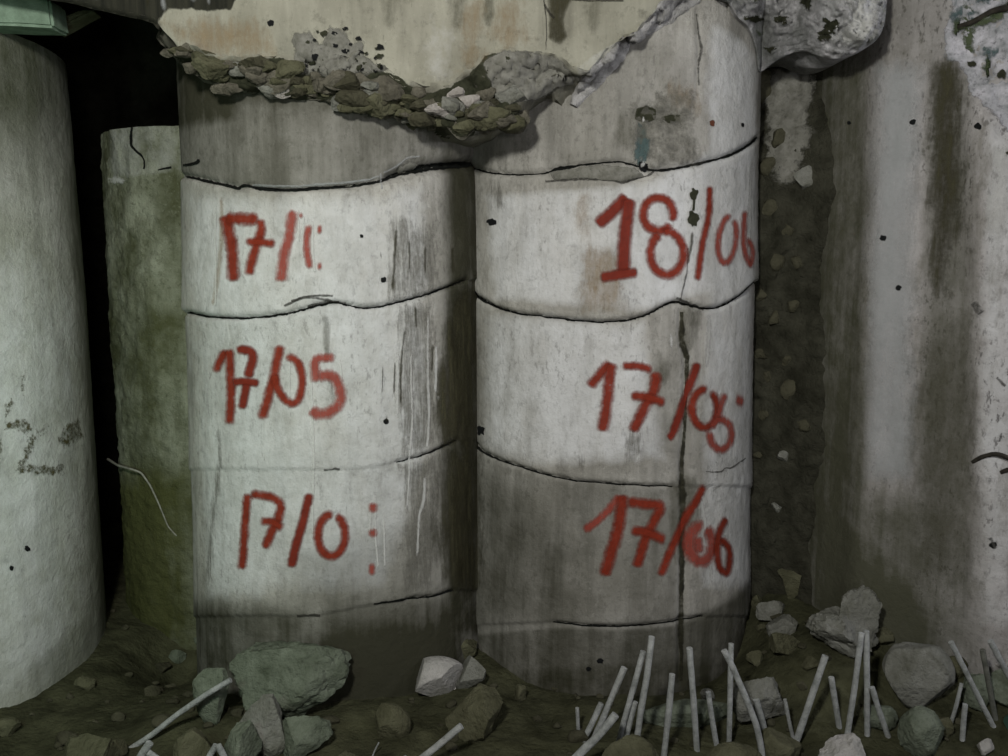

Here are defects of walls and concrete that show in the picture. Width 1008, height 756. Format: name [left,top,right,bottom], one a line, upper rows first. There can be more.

spalling [160,27,531,139]
crack [695,14,703,85]
spalling [944,0,1008,132]
crack [129,127,757,192]
spalling [634,96,696,172]
leakage [930,61,961,292]
leakage [5,401,64,475]
leakage [58,420,82,444]
crack [189,248,754,681]